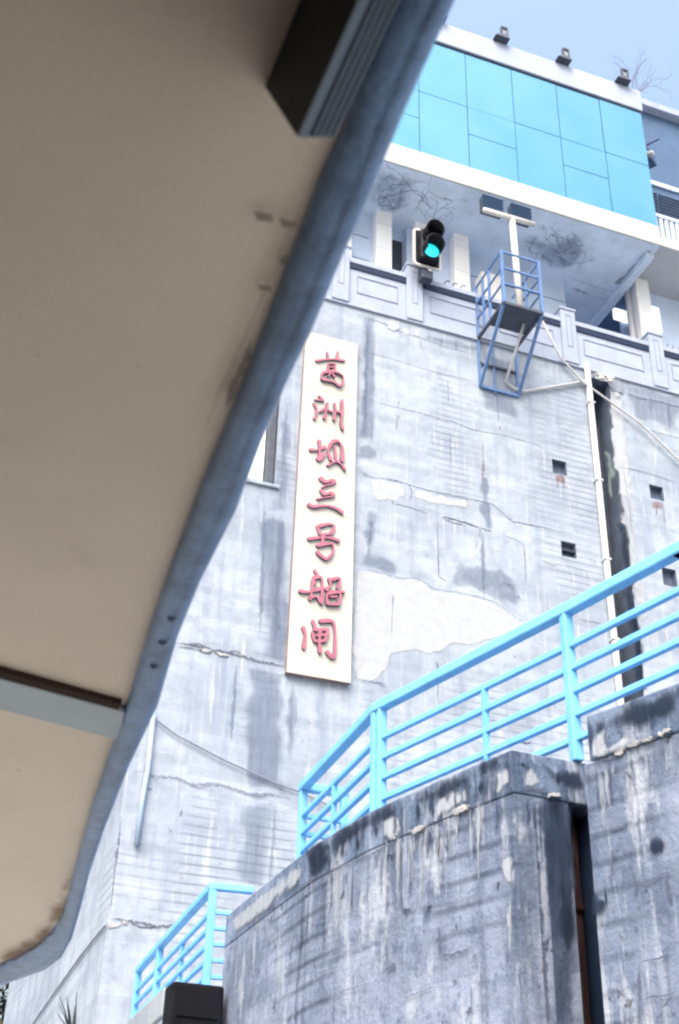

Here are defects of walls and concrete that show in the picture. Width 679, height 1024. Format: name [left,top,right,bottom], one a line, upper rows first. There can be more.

crack [369,476,552,582]
crack [177,643,284,666]
leakage [588,688,679,757]
crack [147,774,289,799]
leakage [526,770,538,785]
leakage [548,769,583,788]
leakage [233,758,508,945]
leakage [650,838,663,853]
crack [108,819,172,929]
leakage [502,857,512,882]
leakage [527,802,574,1024]